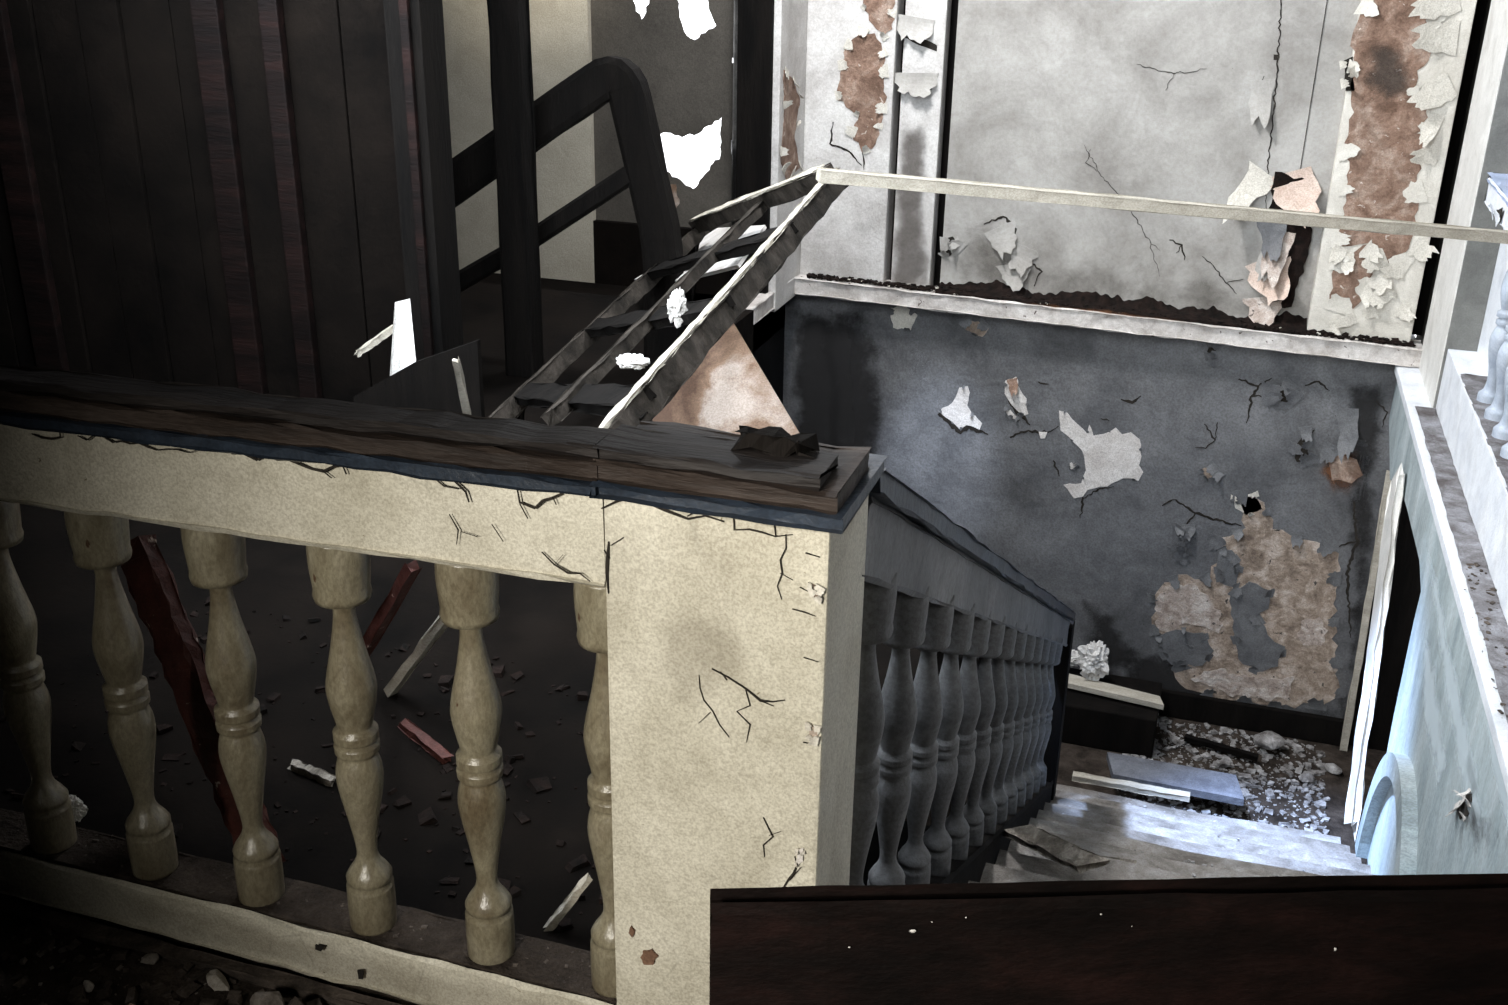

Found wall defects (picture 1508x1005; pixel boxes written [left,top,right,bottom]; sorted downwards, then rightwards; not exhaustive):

peeling [834,0,897,154]
peeling [1325,0,1461,335]
peeling [1222,161,1321,326]
crack [437,481,563,545]
crack [541,501,820,617]
peeling [938,386,988,435]
peeling [1059,411,1143,499]
flaking render [1147,462,1346,711]
crack [699,668,785,742]